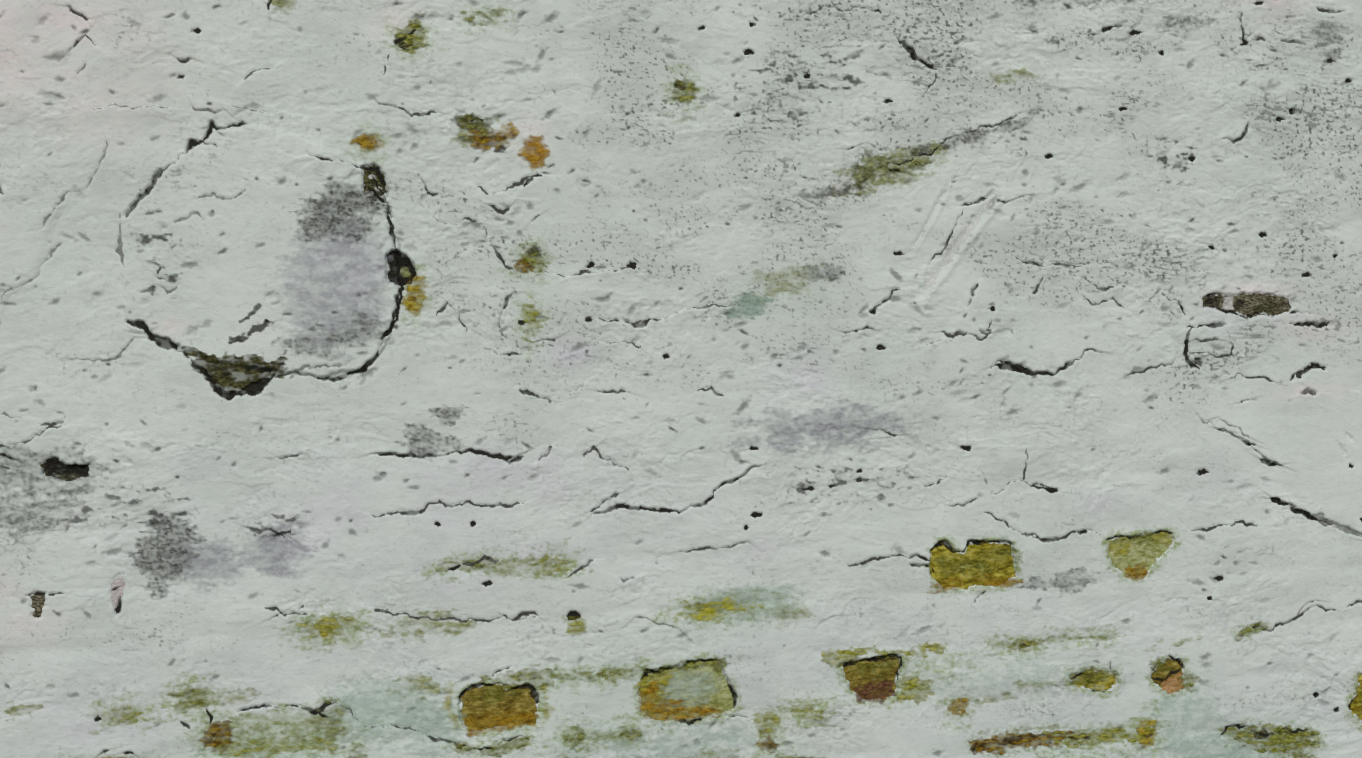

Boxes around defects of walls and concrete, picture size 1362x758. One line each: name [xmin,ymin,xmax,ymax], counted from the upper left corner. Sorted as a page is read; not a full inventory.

spalling [1202,293,1330,328]
crack [932,323,1095,376]
crack [376,446,552,463]
crack [583,445,755,514]
crack [372,500,520,517]
crack [685,542,744,553]
spalling [909,537,1022,593]
spalling [1102,528,1180,580]
spalling [447,667,548,736]
spalling [634,653,745,725]
spalling [822,643,944,708]
spalling [1147,641,1198,696]